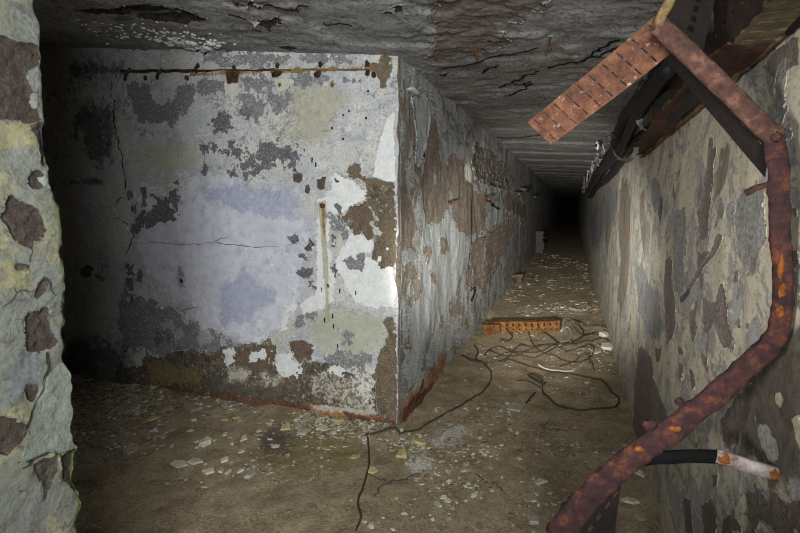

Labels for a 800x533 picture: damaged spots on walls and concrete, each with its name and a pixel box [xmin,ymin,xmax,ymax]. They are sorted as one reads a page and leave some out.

spalling [0,193,46,250]
spalling [0,34,51,191]
spalling [23,277,58,354]
crack [110,84,298,253]
rust [189,63,373,87]
peeling [114,45,526,431]
rust [319,201,329,322]
crack [437,39,620,96]
rust [606,179,630,319]
rust [775,255,786,319]
peeling [0,362,77,502]
rust [157,352,446,424]